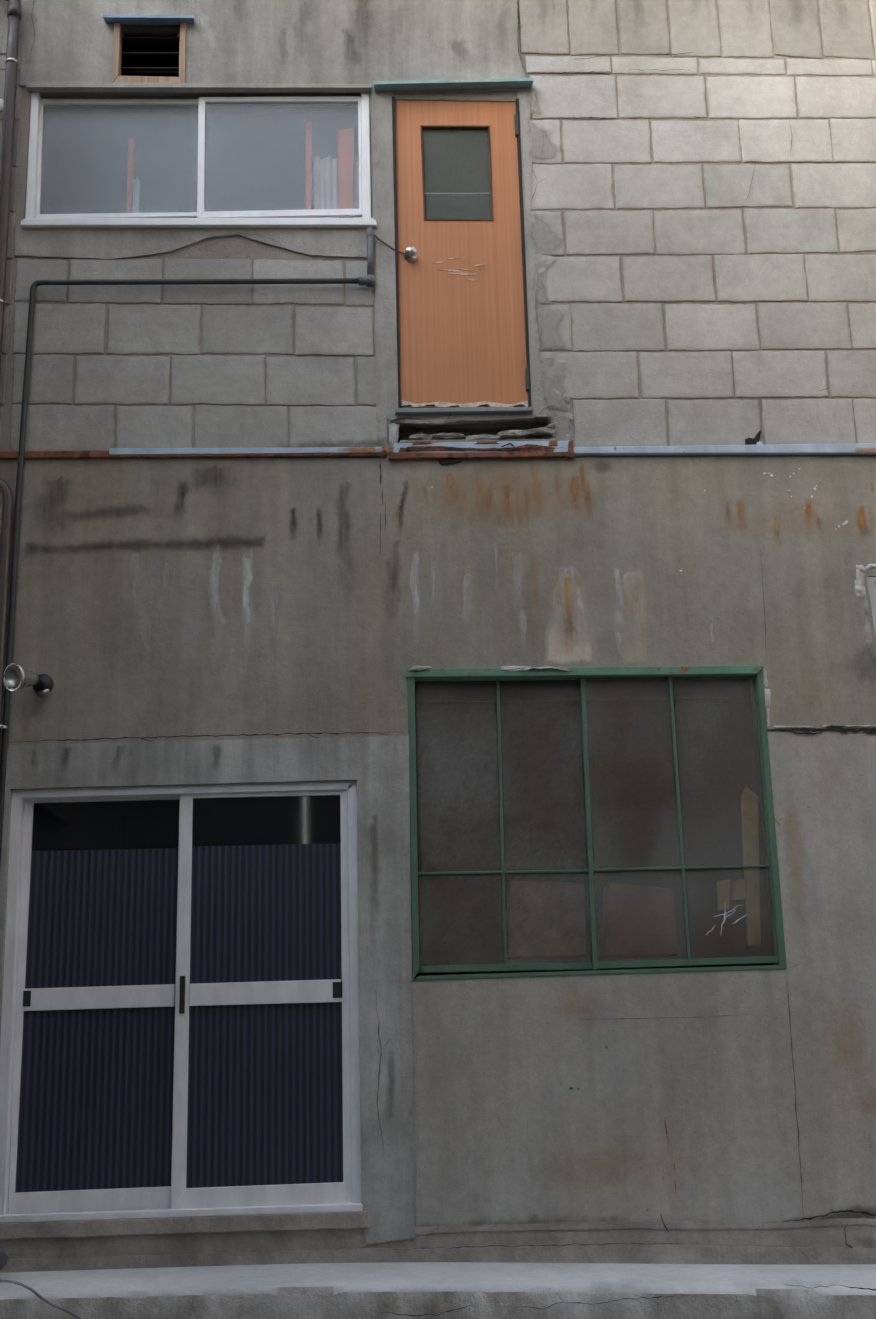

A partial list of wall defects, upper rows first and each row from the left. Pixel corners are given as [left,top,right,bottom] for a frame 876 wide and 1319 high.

spalling [389,404,574,465]
leakage [547,566,593,664]
crack [771,725,876,735]